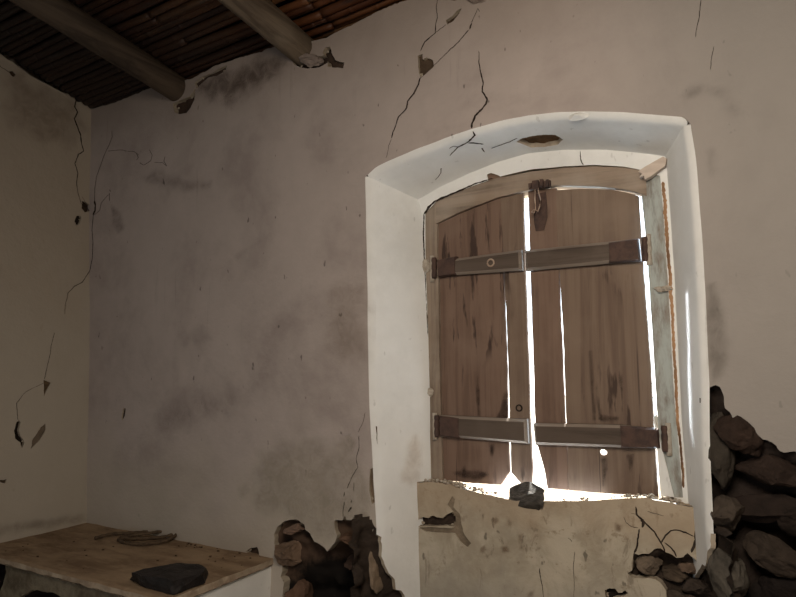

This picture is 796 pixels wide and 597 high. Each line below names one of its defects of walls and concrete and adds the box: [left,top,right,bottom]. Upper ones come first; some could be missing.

crack [420,0,444,51]
crack [386,9,480,157]
spalling [522,135,560,143]
crack [65,100,166,304]
flaking render [274,514,402,597]
crack [624,506,696,557]
flaking render [630,385,796,597]